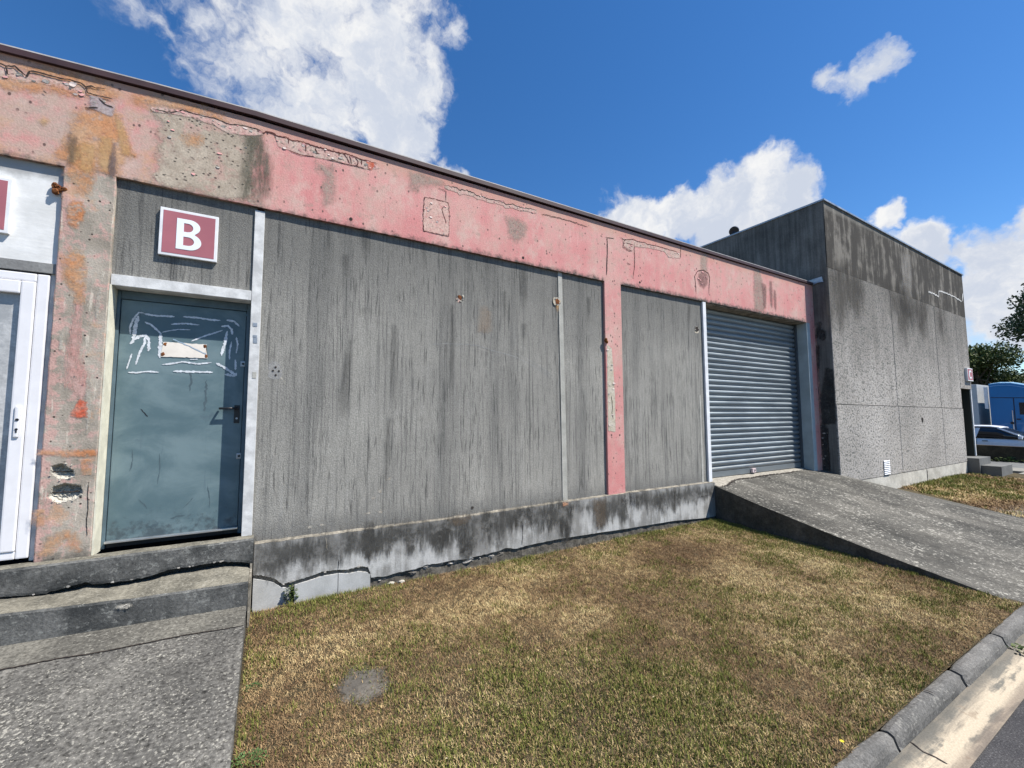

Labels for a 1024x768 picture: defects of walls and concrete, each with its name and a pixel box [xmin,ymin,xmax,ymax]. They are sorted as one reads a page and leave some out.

peeling [0,64,115,116]
peeling [151,106,262,205]
peeling [411,174,537,240]
spalling [47,463,83,504]
crack [60,541,370,590]
damp [405,533,415,553]